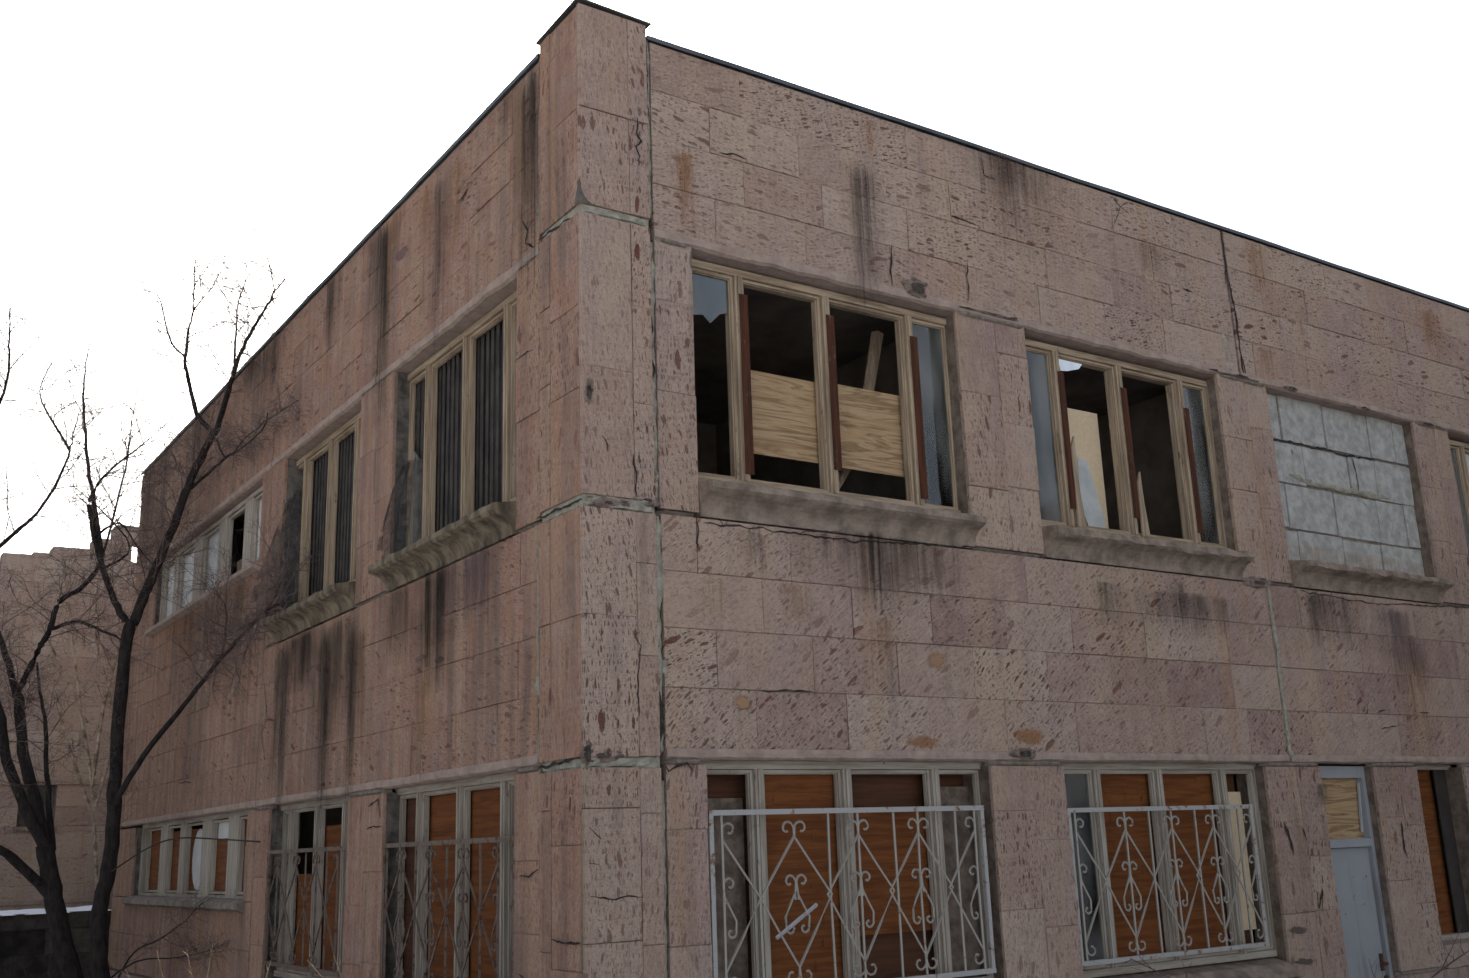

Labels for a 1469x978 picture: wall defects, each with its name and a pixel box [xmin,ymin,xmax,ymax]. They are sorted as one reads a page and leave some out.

water stain [378,232,388,338]
water stain [394,573,442,655]
water stain [272,621,360,807]
crack [551,938,580,946]
crack [591,895,665,945]